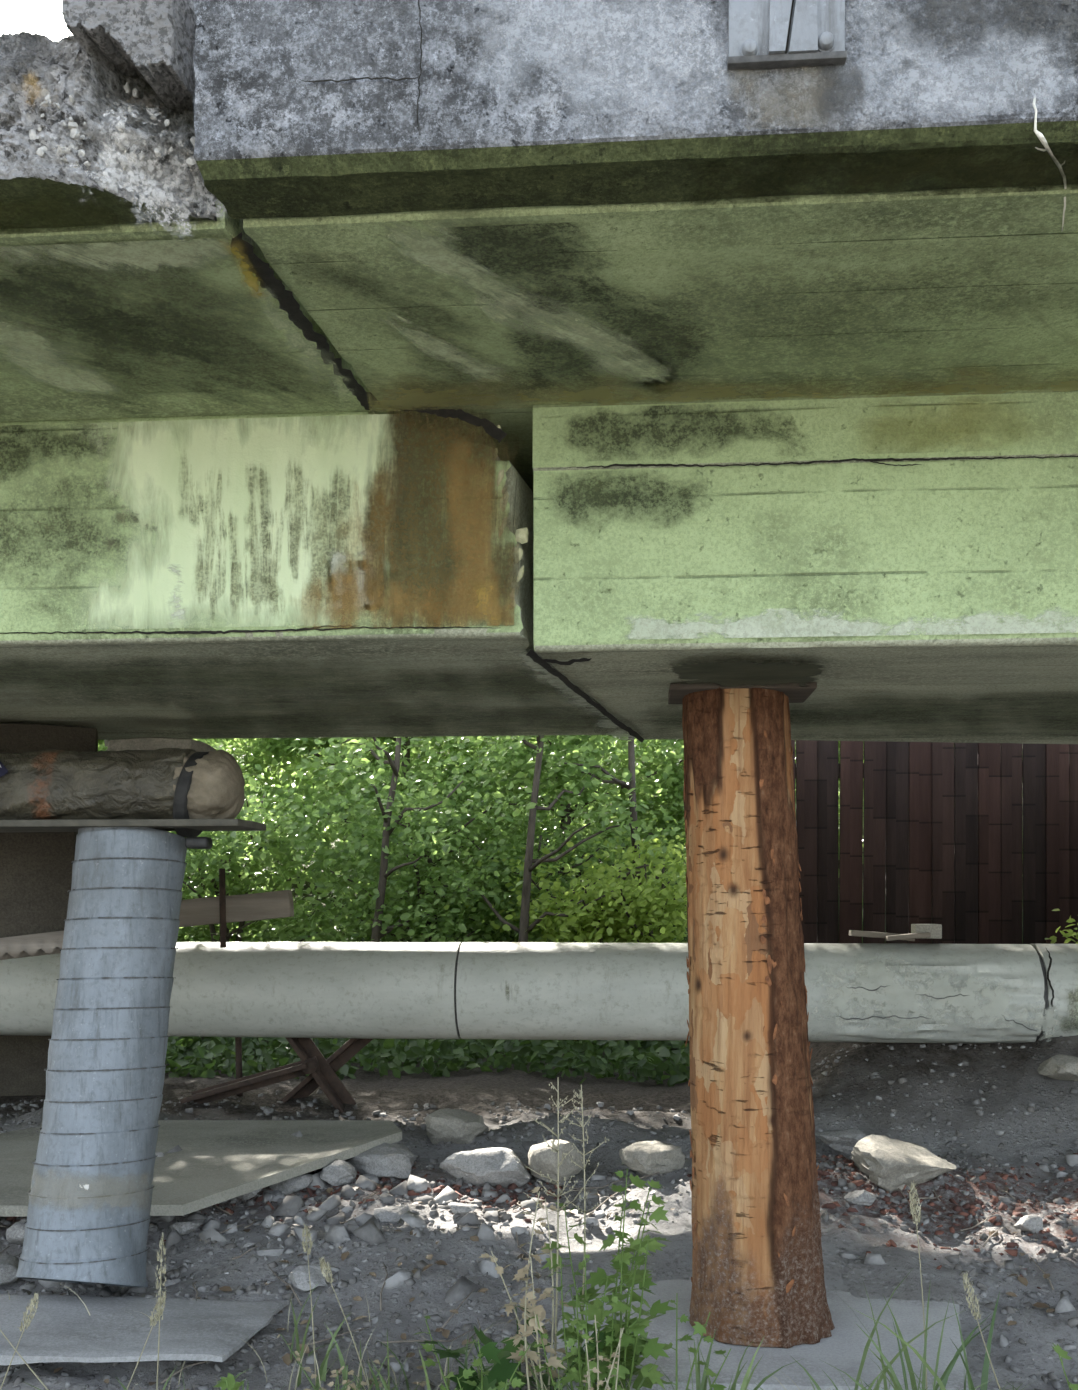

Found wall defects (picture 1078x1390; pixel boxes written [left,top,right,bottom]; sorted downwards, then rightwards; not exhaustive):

spalling [29,83,226,231]
crack [1032,95,1067,232]
crack [231,232,507,443]
rust [304,409,519,627]
damp [0,222,1078,629]
crack [557,455,1078,469]
crack [526,650,644,742]